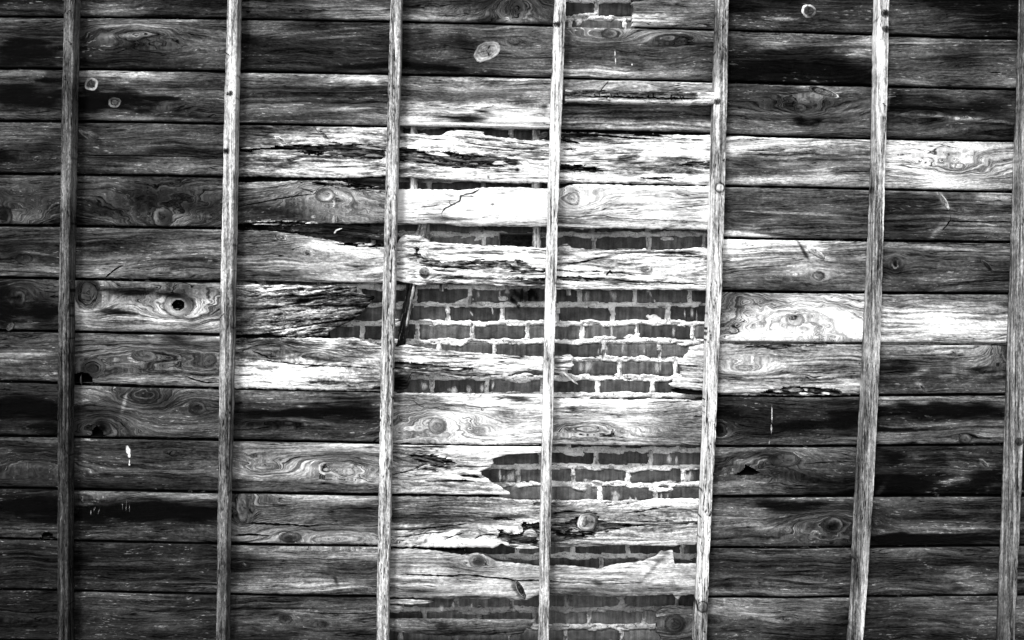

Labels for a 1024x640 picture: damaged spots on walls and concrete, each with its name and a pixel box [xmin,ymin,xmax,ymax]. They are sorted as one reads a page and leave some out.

crack [423,188,481,220]